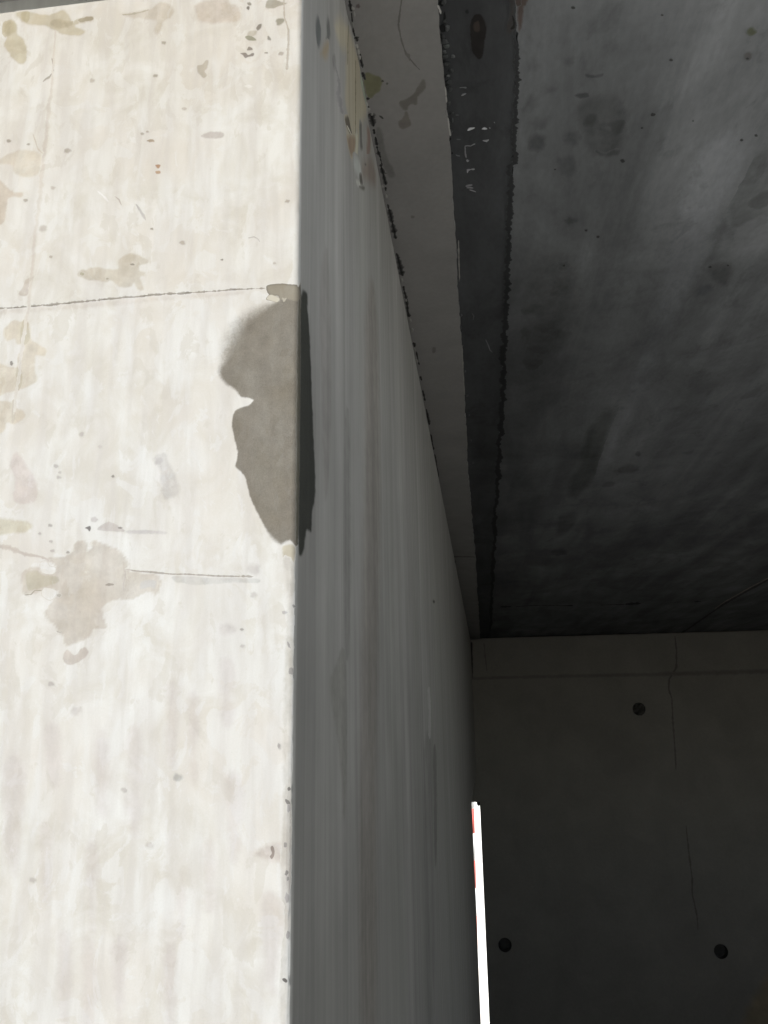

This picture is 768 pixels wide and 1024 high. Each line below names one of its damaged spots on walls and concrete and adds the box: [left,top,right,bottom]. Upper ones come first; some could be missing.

leakage [119,1,176,36]
leakage [193,0,243,26]
leakage [2,9,95,65]
crack [0,30,265,415]
crack [0,543,53,562]
crack [124,568,261,586]